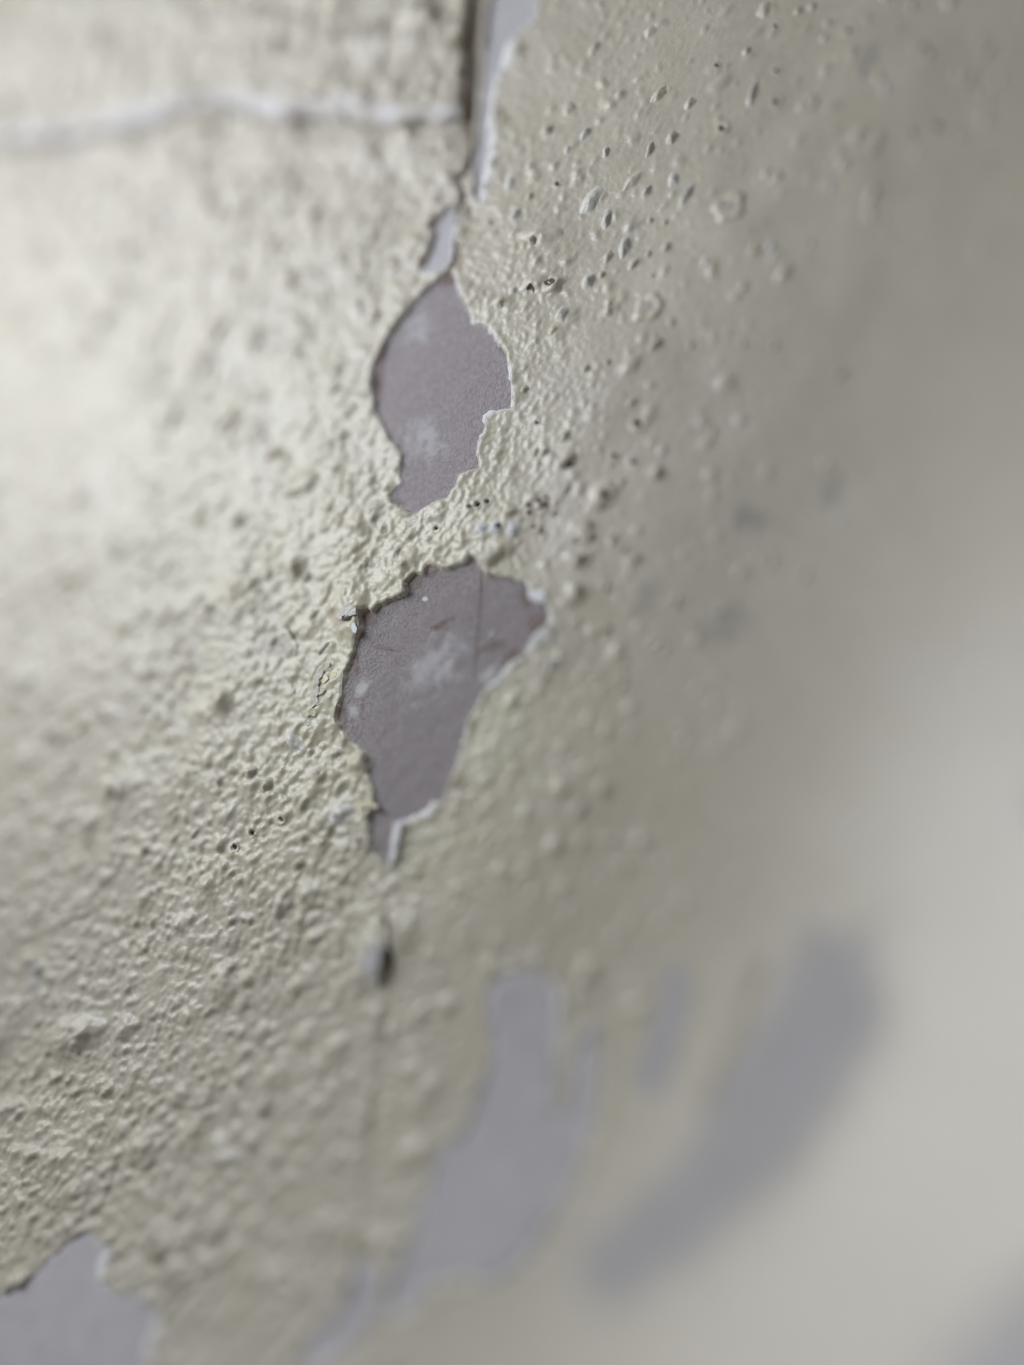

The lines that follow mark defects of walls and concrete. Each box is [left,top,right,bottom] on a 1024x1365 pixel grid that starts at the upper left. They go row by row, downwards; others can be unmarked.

peeling [368,0,541,515]
crack [417,0,509,269]
peeling [303,554,556,869]
peeling [0,1230,161,1365]